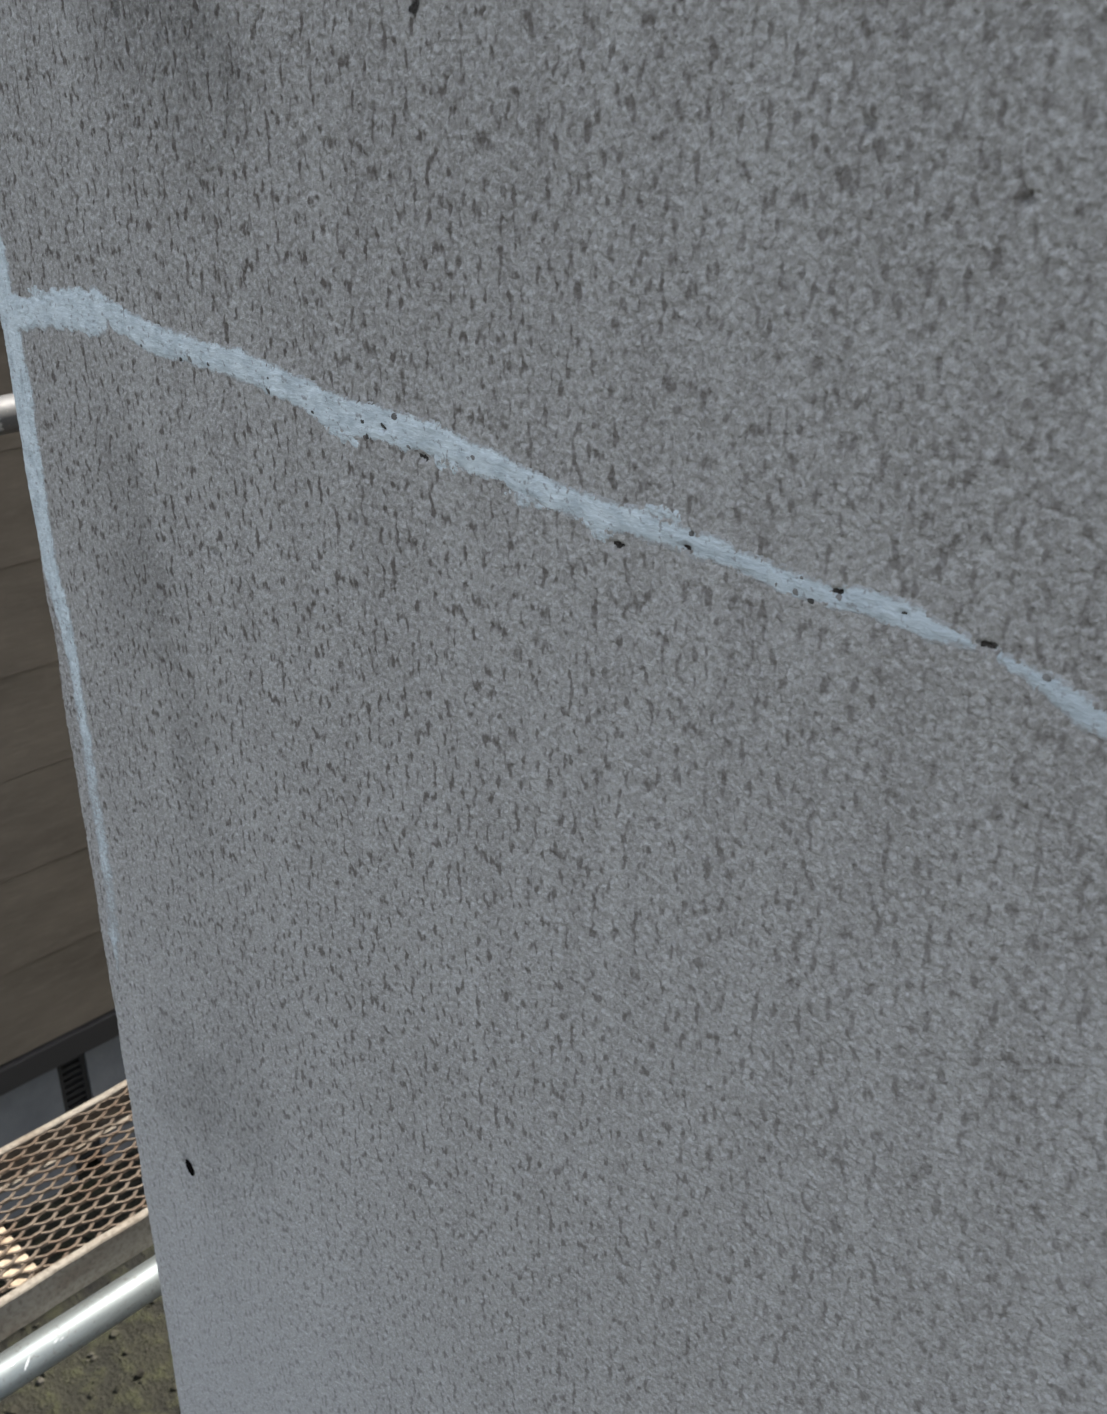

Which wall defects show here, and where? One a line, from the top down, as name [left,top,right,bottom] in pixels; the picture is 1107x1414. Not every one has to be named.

crack [0,237,1107,973]